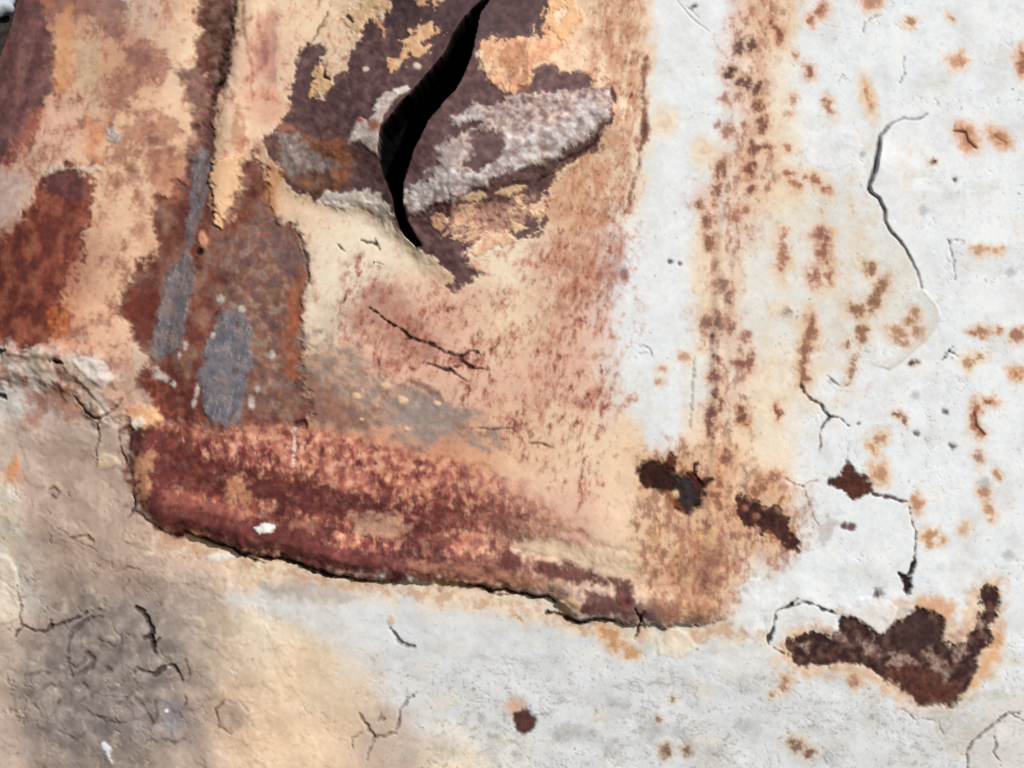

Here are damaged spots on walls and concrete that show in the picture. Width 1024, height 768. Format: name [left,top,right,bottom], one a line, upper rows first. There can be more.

corrosion [921,153,942,170]
crack [367,305,500,383]
corrosion [14,0,933,666]
spalling [632,449,717,518]
peeling [122,513,154,551]
peeling [205,551,240,563]
crack [870,491,918,573]
crack [14,564,250,747]
peeling [553,595,584,616]
crack [765,597,837,656]
corrosion [764,603,918,717]
corrosion [877,569,1015,698]